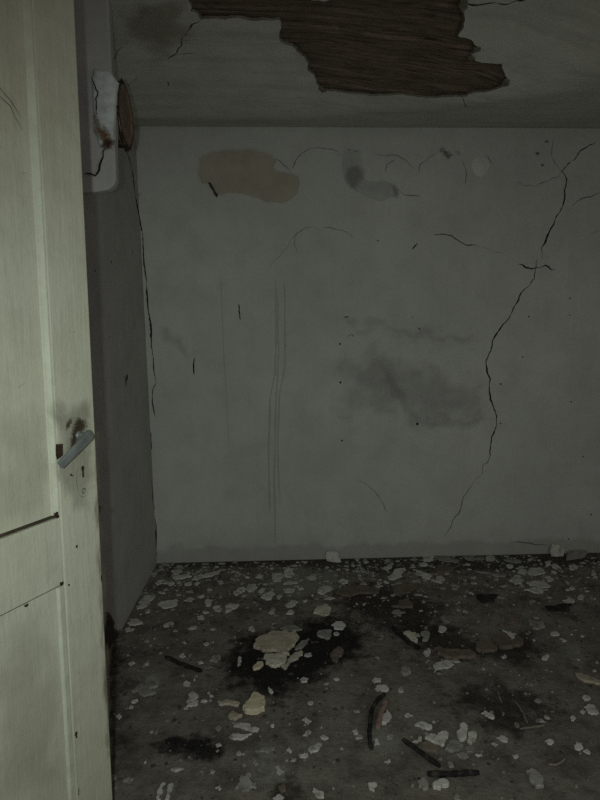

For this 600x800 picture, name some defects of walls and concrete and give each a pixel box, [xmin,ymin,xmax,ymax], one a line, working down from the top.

crack [86,148,105,177]
crack [126,151,156,418]
spalling [188,0,510,98]
crack [434,140,598,532]